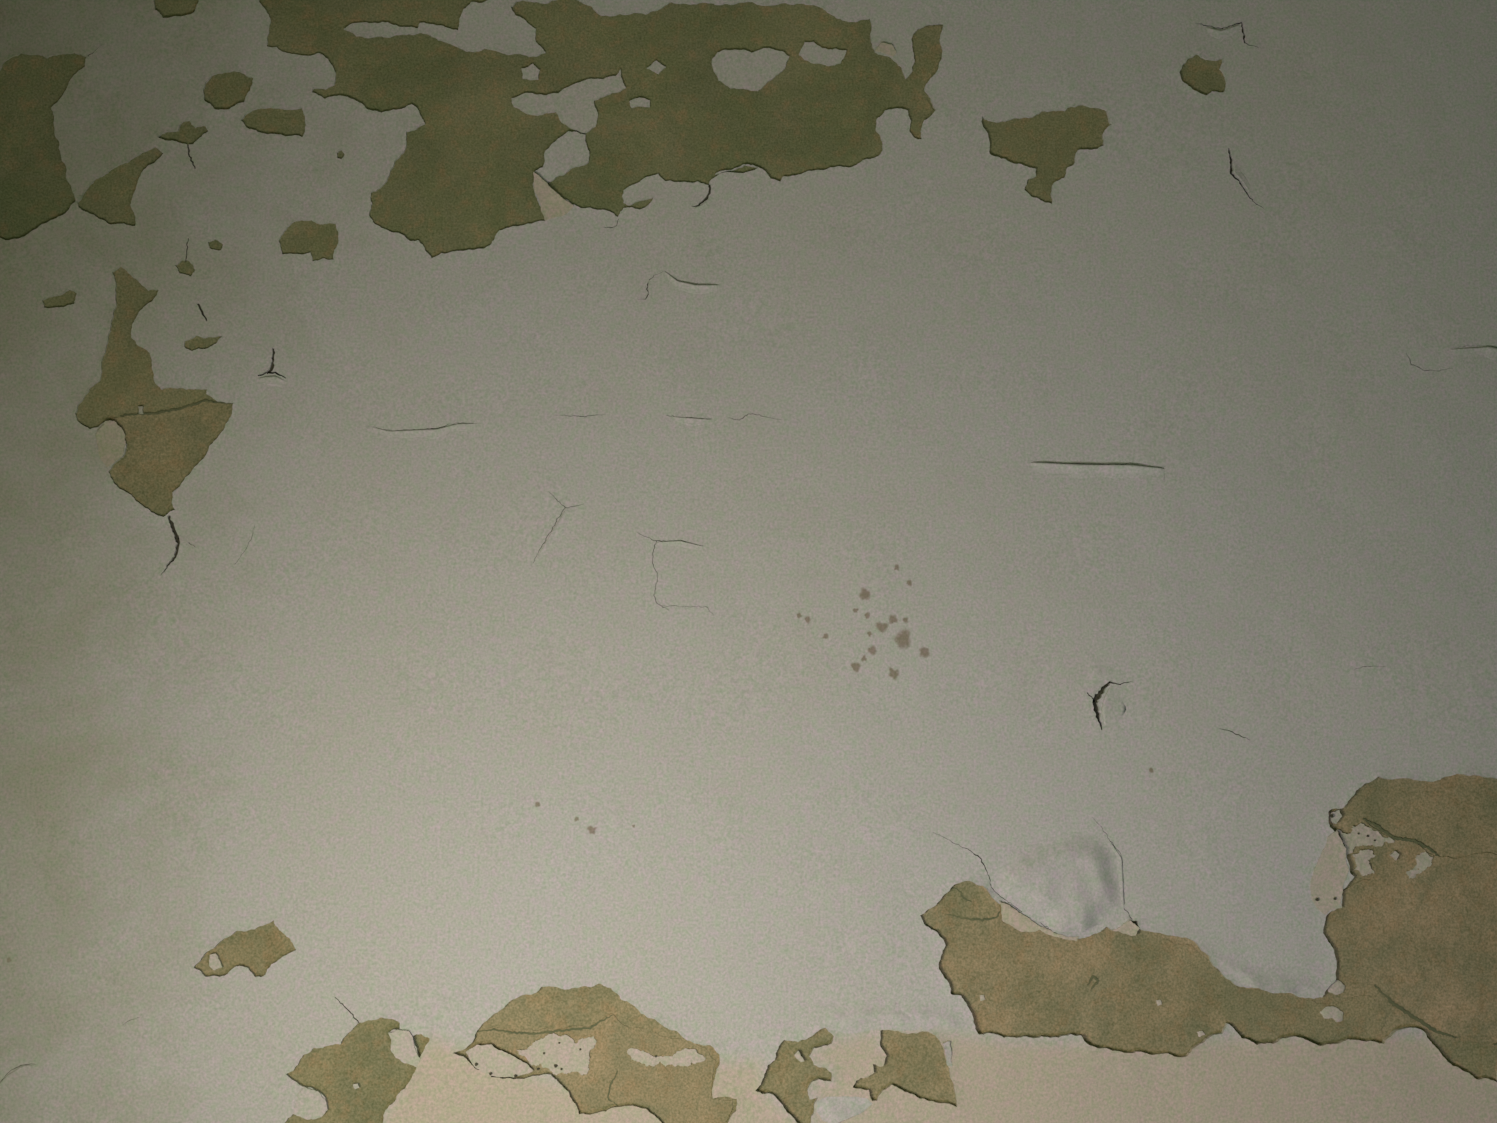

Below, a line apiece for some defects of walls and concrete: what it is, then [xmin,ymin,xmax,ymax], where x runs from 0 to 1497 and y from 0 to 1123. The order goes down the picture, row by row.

peeling [0,53,208,240]
peeling [259,0,943,261]
peeling [981,105,1110,204]
crack [1228,150,1252,194]
crack [645,272,720,300]
peeling [76,267,233,517]
crack [1031,461,1165,479]
crack [167,516,189,567]
crack [1090,681,1128,727]
peeling [920,774,1497,1081]
peeling [285,997,420,1123]
peeling [456,984,737,1123]